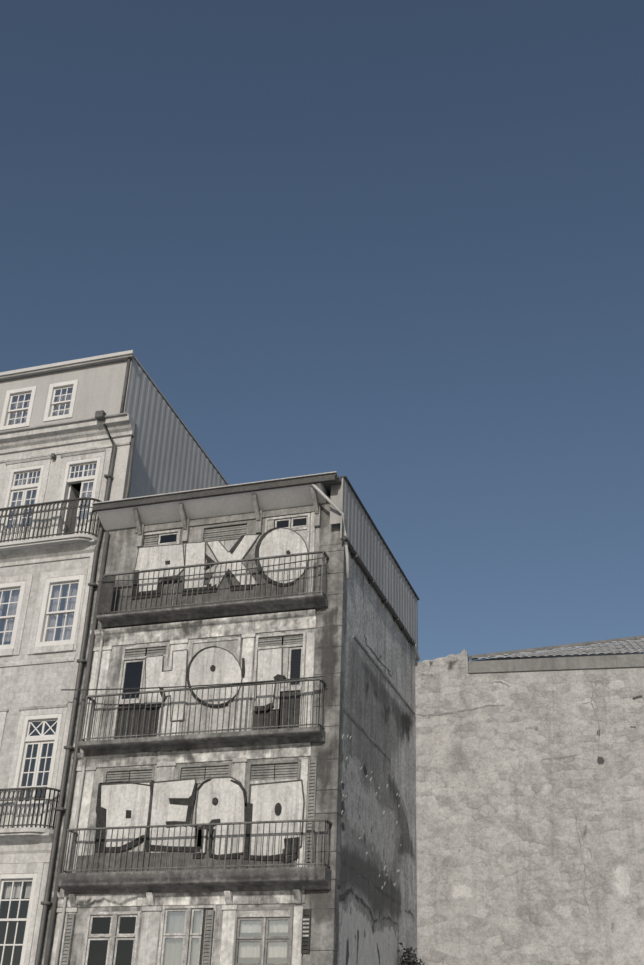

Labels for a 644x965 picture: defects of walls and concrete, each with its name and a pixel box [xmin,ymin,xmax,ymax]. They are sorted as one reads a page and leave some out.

crack [363,572,392,677]
damp [366,666,411,737]
damp [311,848,414,924]